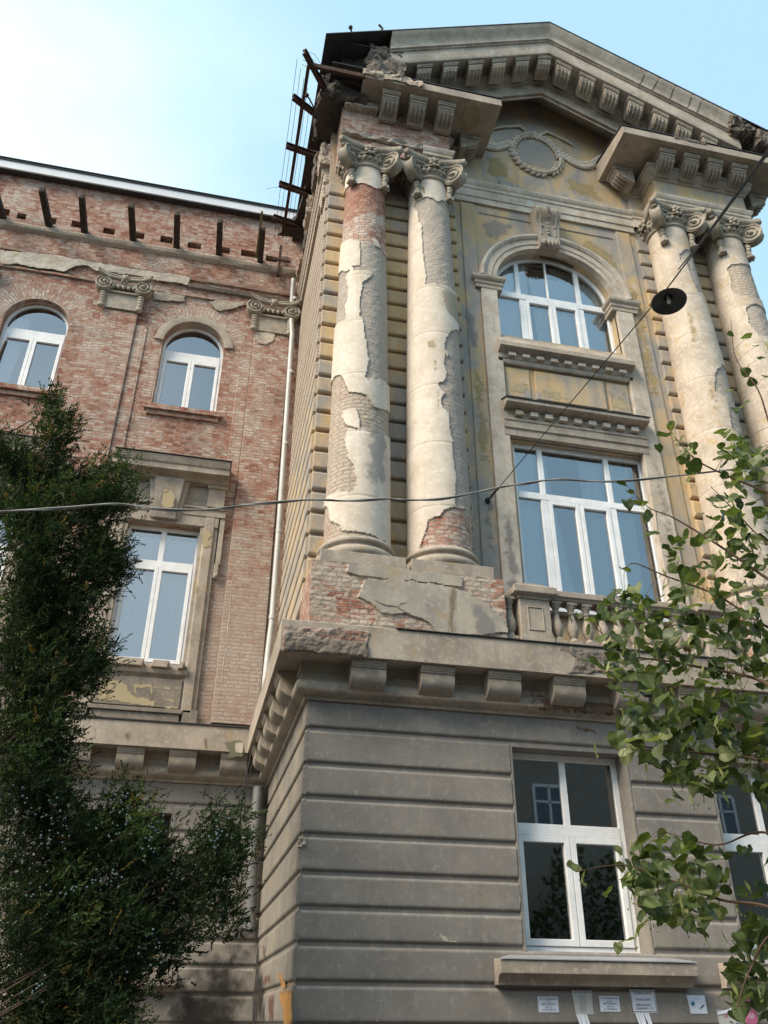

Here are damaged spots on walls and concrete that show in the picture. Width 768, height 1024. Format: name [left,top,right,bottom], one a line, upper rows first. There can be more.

spalling [727,115,768,154]
peeling [0,250,190,302]
peeling [336,183,389,386]
peeling [727,263,768,336]
peeling [714,364,744,437]
peeling [323,374,390,544]
peeling [419,329,488,553]
peeling [281,559,508,658]
peeling [97,678,178,709]
rust [278,974,292,1024]